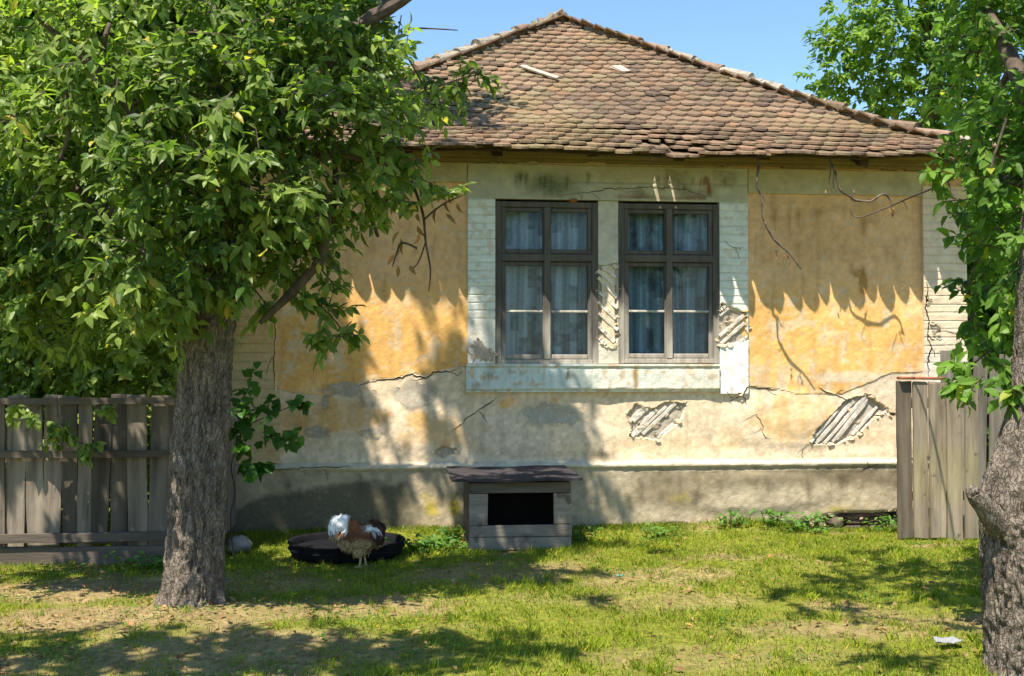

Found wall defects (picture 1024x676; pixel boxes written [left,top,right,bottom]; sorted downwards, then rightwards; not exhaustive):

crack [563,186,712,200]
spalling [595,262,621,349]
spalling [715,304,752,348]
spalling [470,337,499,362]
crack [347,350,475,391]
crack [454,397,496,430]
spalling [627,401,686,442]
crack [819,386,848,400]
spalling [810,393,896,445]